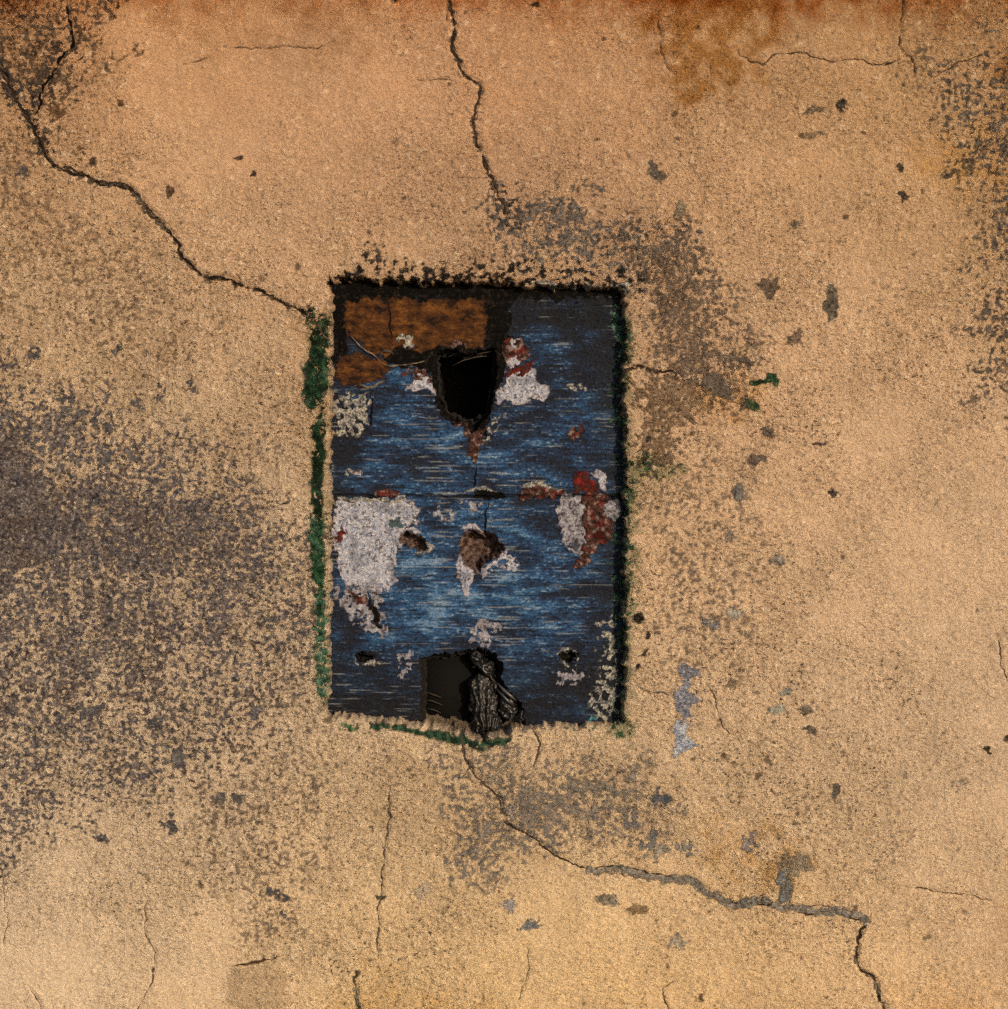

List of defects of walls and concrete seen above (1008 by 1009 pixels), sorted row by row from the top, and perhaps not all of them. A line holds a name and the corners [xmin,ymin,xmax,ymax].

crack [0,1,331,340]
crack [417,0,511,219]
flaking render [648,160,667,182]
peeling [22,221,116,299]
peeling [474,177,803,758]
peeling [0,286,550,943]
crack [137,899,156,1009]
crack [233,955,278,967]
crack [353,971,362,1009]
crack [376,785,392,955]
flaking render [595,893,648,916]
crack [460,723,885,1009]